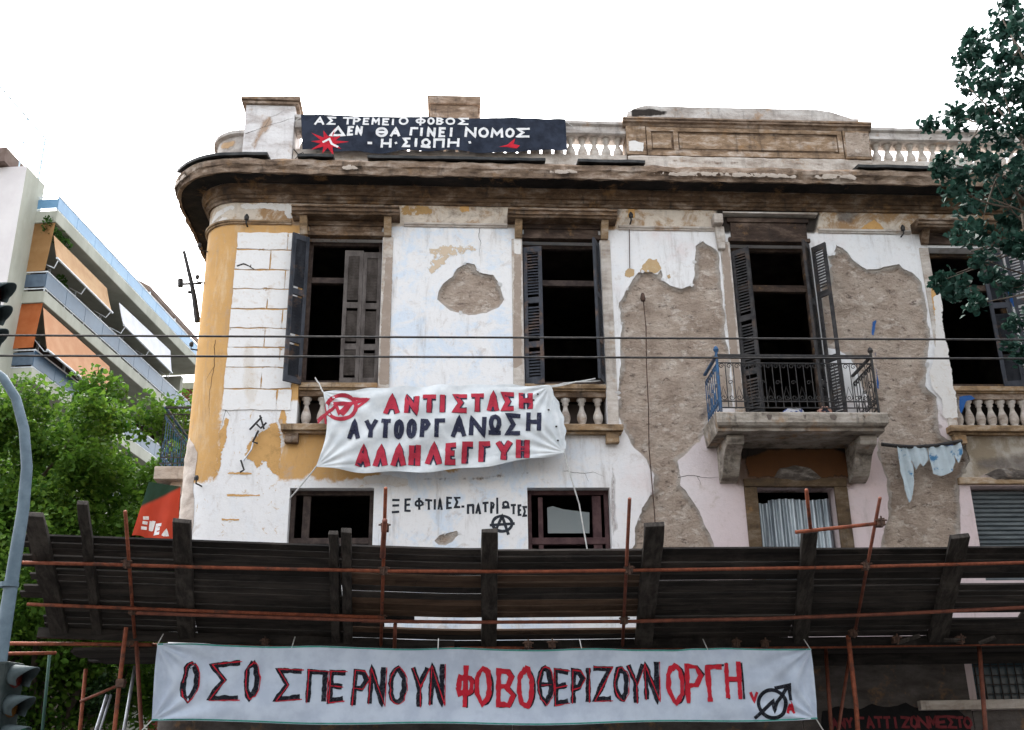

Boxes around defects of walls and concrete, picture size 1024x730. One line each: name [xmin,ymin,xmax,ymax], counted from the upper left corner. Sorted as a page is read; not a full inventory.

spalling [429,245,522,368]
peeling [213,410,287,480]
spalling [615,241,744,549]
spalling [822,246,969,547]
spalling [435,531,461,545]